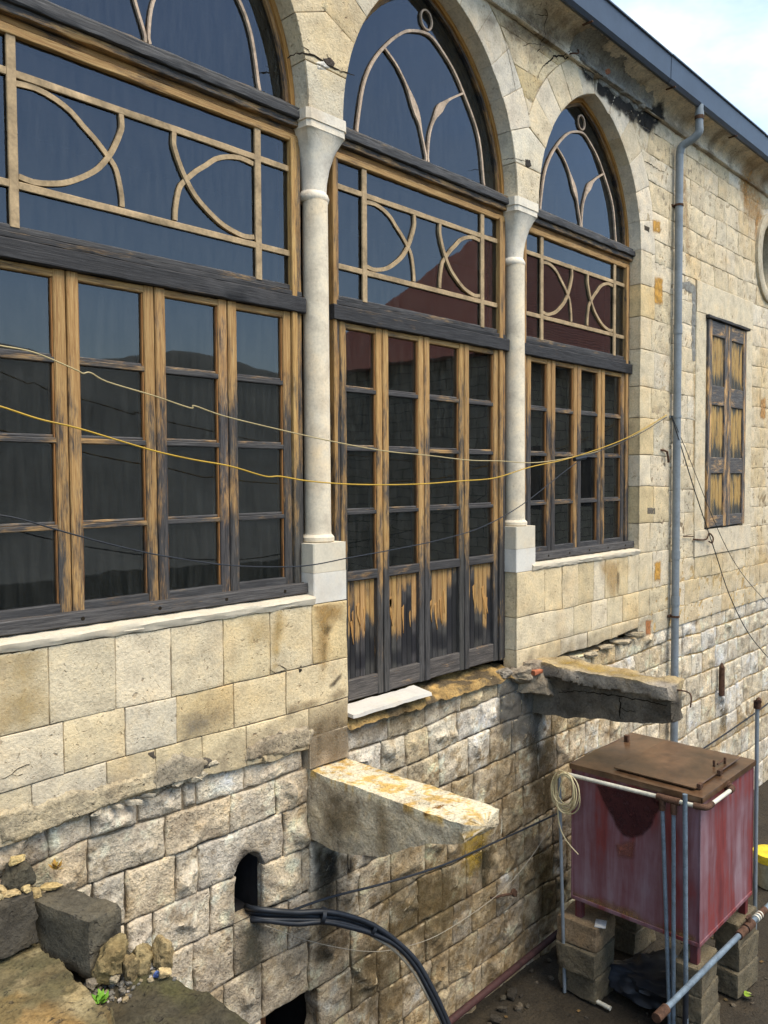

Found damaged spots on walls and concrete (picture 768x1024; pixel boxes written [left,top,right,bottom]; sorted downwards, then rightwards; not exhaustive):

crack [287,46,354,76]
crack [498,0,570,89]
water stain [582,67,665,134]
rust [655,278,663,303]
crack [559,690,667,719]
water stain [316,851,353,908]
water stain [317,925,334,961]